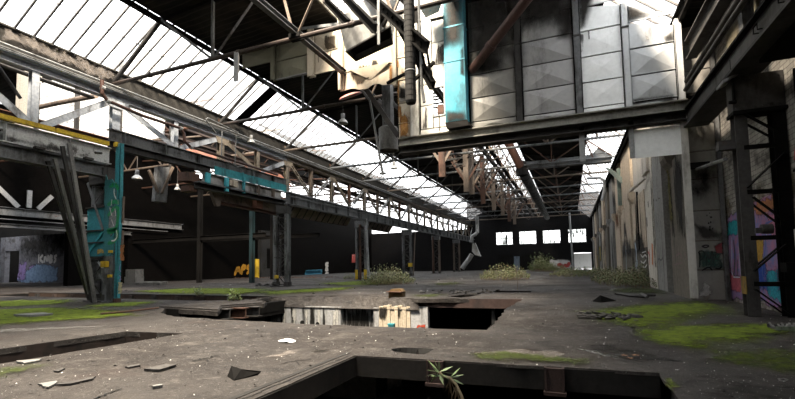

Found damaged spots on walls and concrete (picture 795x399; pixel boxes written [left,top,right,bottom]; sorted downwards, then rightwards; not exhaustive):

corrosion [389,60,409,136]